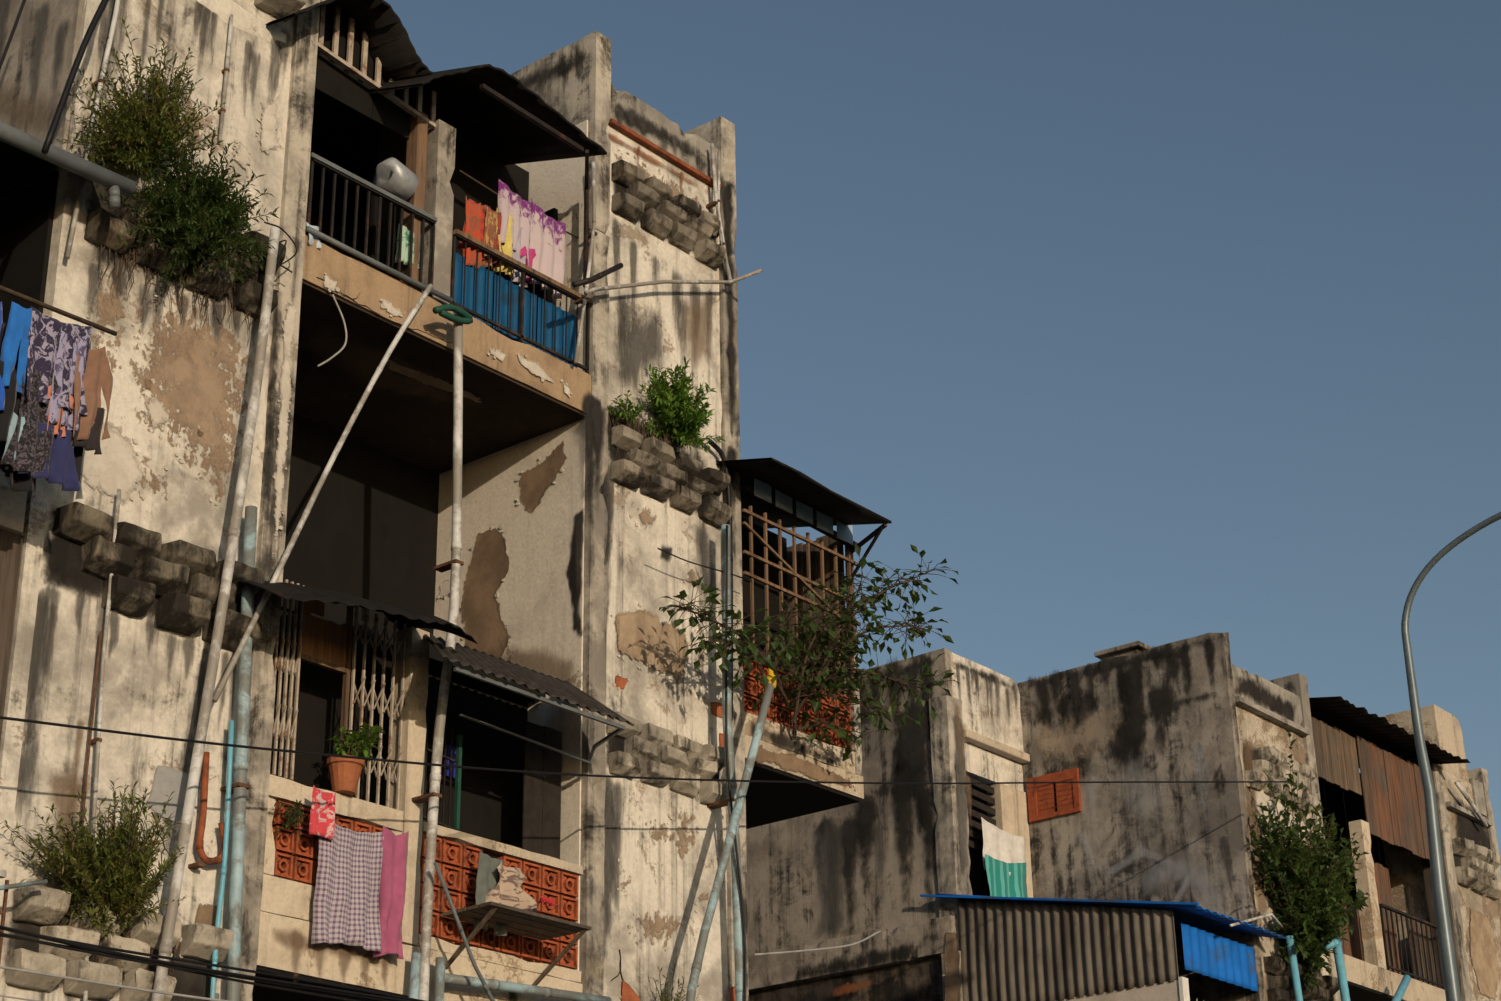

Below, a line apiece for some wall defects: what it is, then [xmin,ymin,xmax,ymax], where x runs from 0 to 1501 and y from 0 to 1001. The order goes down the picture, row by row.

water stain [0,0,67,119]
flaking render [81,270,253,519]
flaking render [323,273,340,293]
flaking render [487,348,572,397]
flaking render [515,441,567,513]
water stain [613,183,736,423]
water stain [17,536,119,803]
water stain [147,597,236,773]
flaking render [437,525,511,658]
flaking render [611,602,693,690]
water stain [815,656,936,934]
water stain [954,637,1215,872]